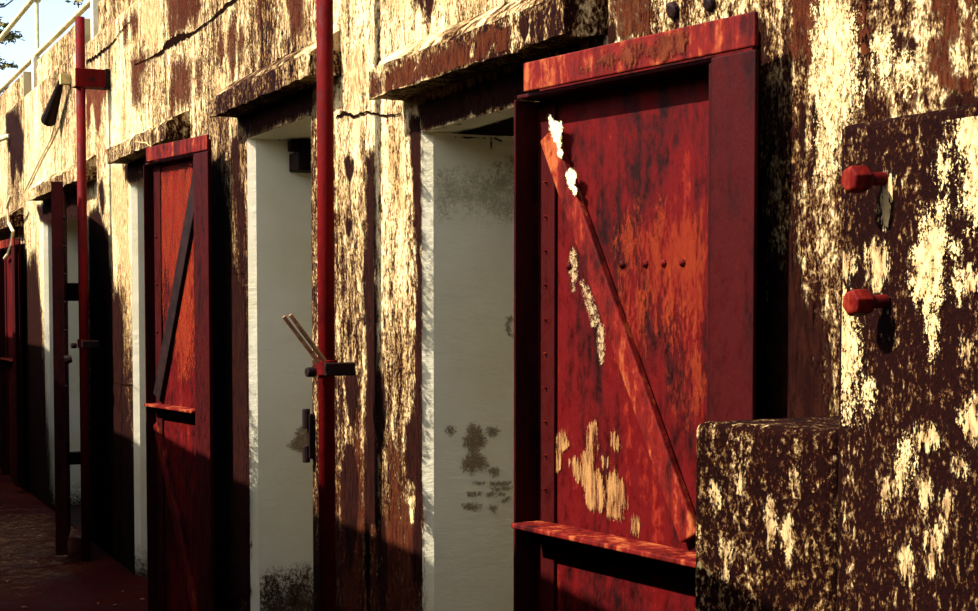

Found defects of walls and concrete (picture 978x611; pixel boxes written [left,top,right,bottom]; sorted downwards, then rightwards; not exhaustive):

crack [86,20,131,63]
crack [134,0,235,69]
leakage [412,0,434,23]
leakage [606,0,653,44]
crack [336,111,401,119]
leakage [341,68,539,611]
mould [260,563,313,611]